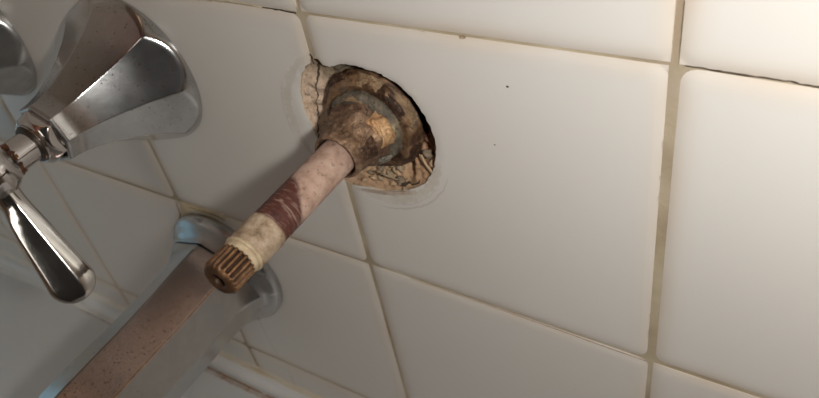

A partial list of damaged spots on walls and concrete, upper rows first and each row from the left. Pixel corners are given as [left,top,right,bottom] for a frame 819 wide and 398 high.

spalling [301,58,436,190]